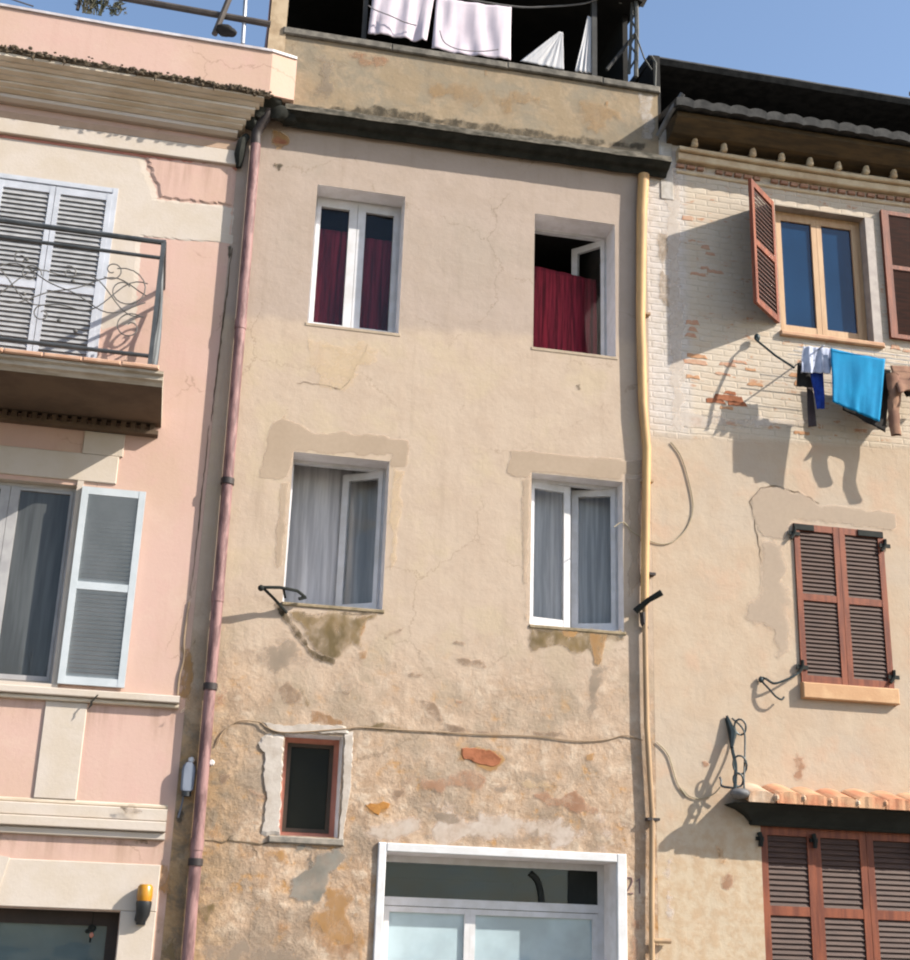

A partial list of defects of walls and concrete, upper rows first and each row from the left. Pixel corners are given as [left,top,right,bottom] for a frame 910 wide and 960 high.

water stain [318,105,645,150]
peeling [146,157,235,206]
peeling [746,542,792,657]
water stain [259,603,376,673]
water stain [529,628,624,713]
flaking render [460,747,505,771]
peeling [365,780,601,850]